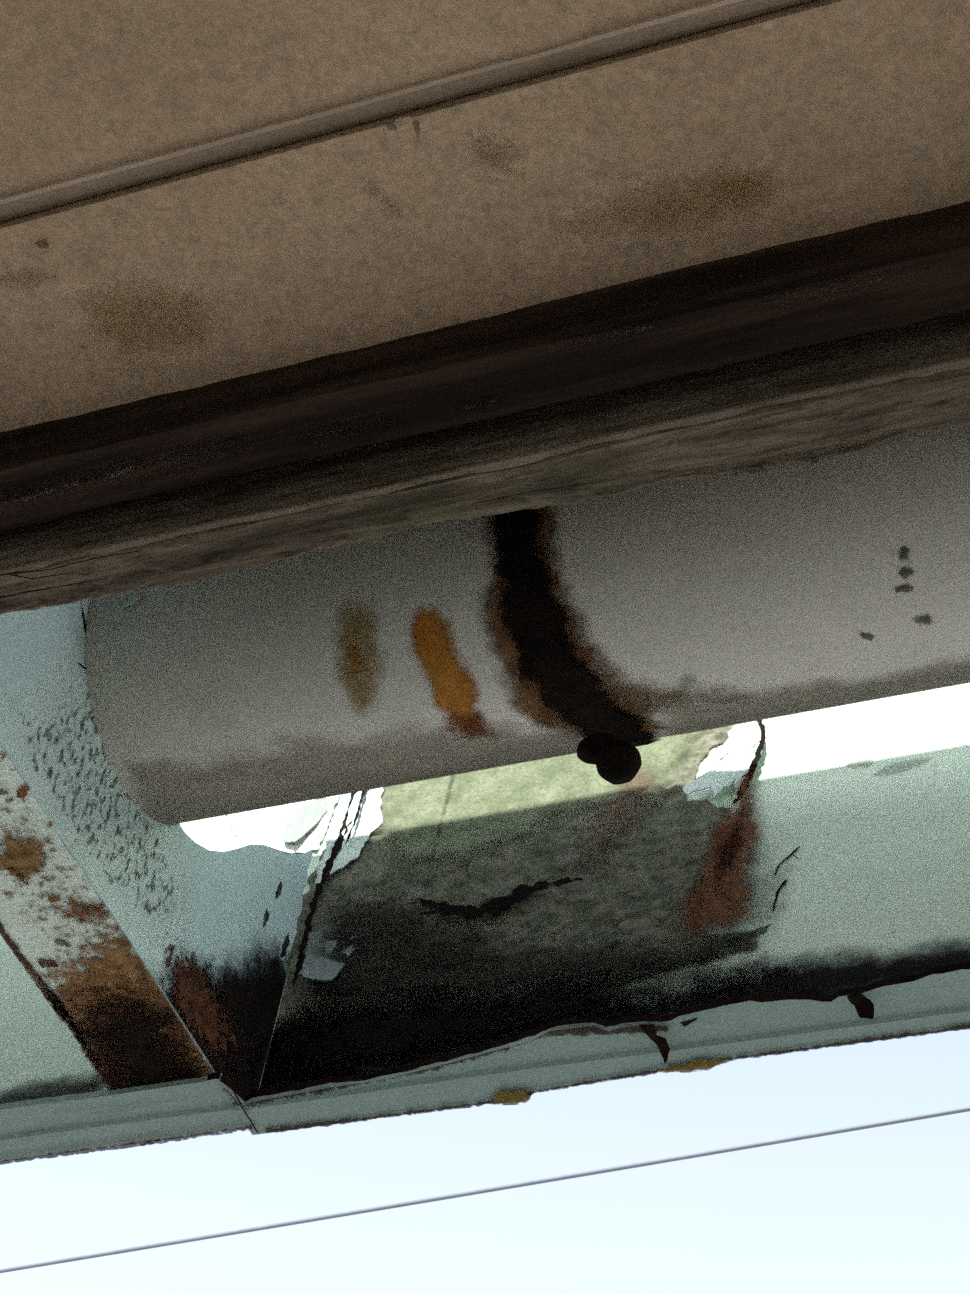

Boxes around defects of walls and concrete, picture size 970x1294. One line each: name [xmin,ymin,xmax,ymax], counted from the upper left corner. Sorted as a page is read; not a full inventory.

corrosion [340,610,376,707]
corrosion [412,611,489,736]
corrosion [485,506,702,785]
corrosion [0,778,970,1107]
peeling [227,720,771,1021]
corrosion [0,1099,496,1165]